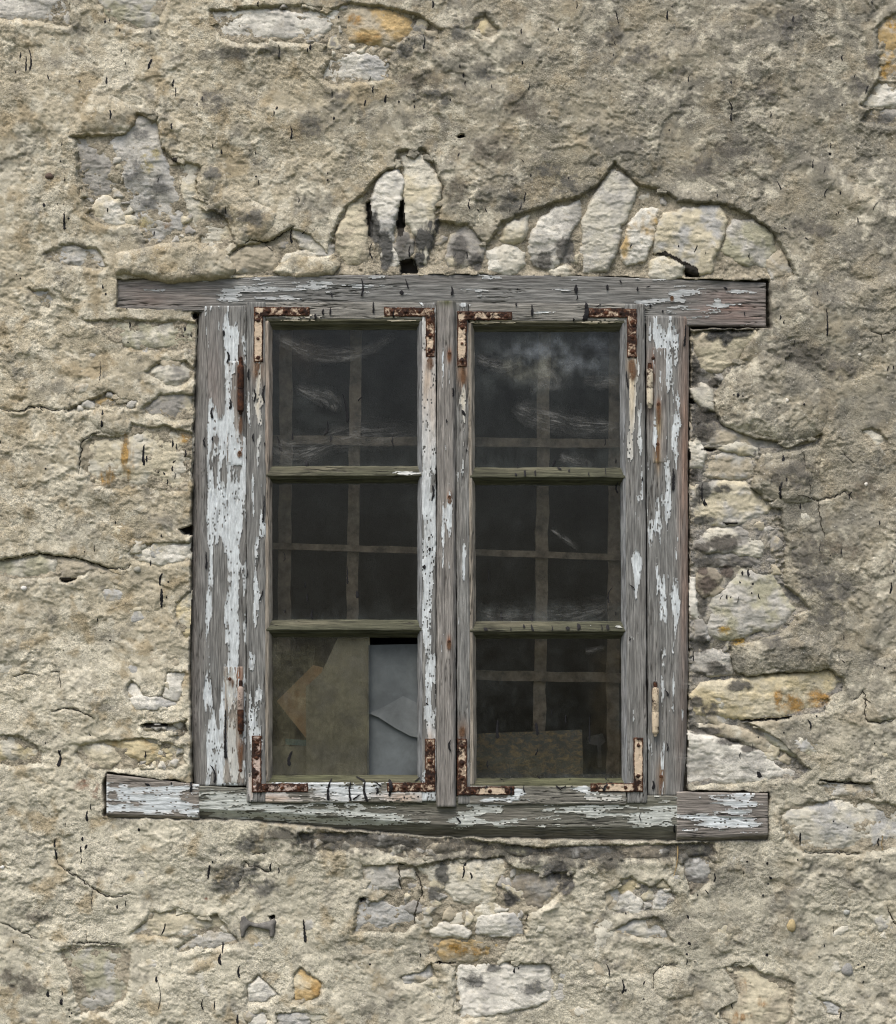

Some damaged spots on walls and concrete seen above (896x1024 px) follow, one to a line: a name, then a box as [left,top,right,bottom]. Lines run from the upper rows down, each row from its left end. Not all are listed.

crack [4,552,130,570]
spalling [61,111,843,1024]